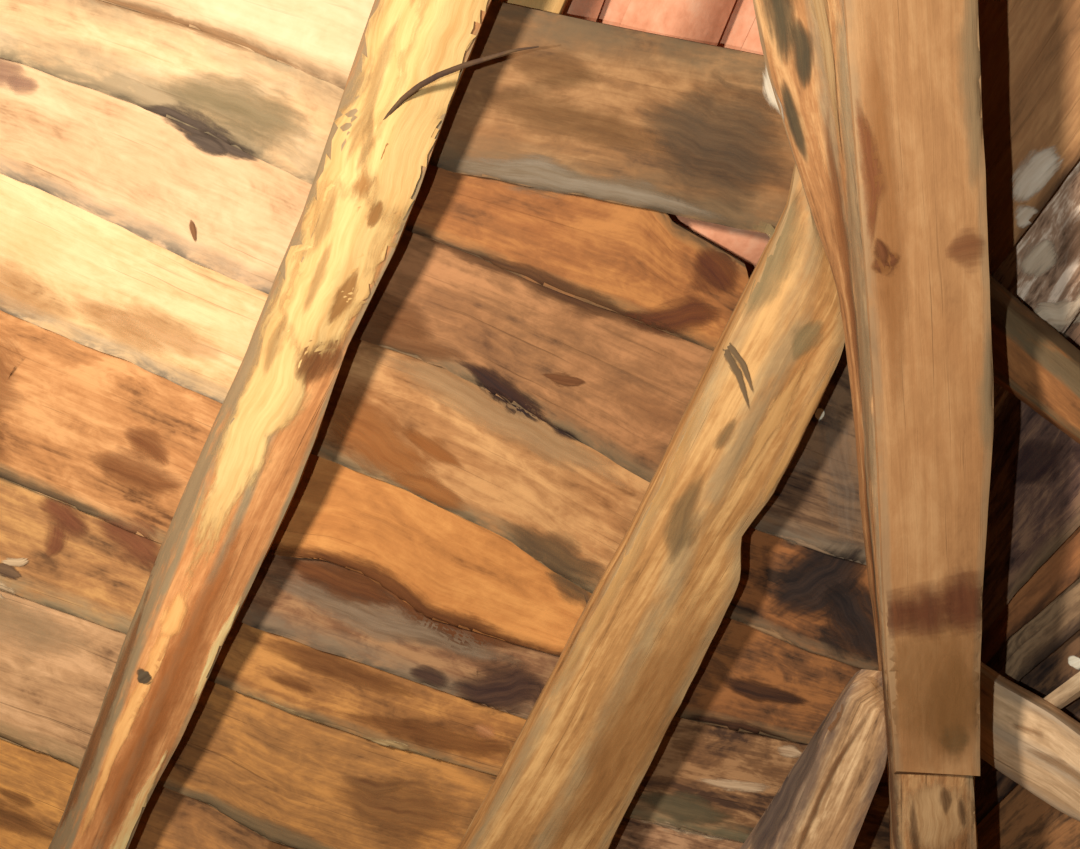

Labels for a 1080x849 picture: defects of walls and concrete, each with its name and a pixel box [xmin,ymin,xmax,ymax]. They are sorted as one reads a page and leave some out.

leakage [764,0,811,86]
leakage [144,82,294,160]
leakage [782,86,805,155]
leakage [1062,218,1080,263]
leakage [354,299,600,465]
leakage [776,551,898,849]